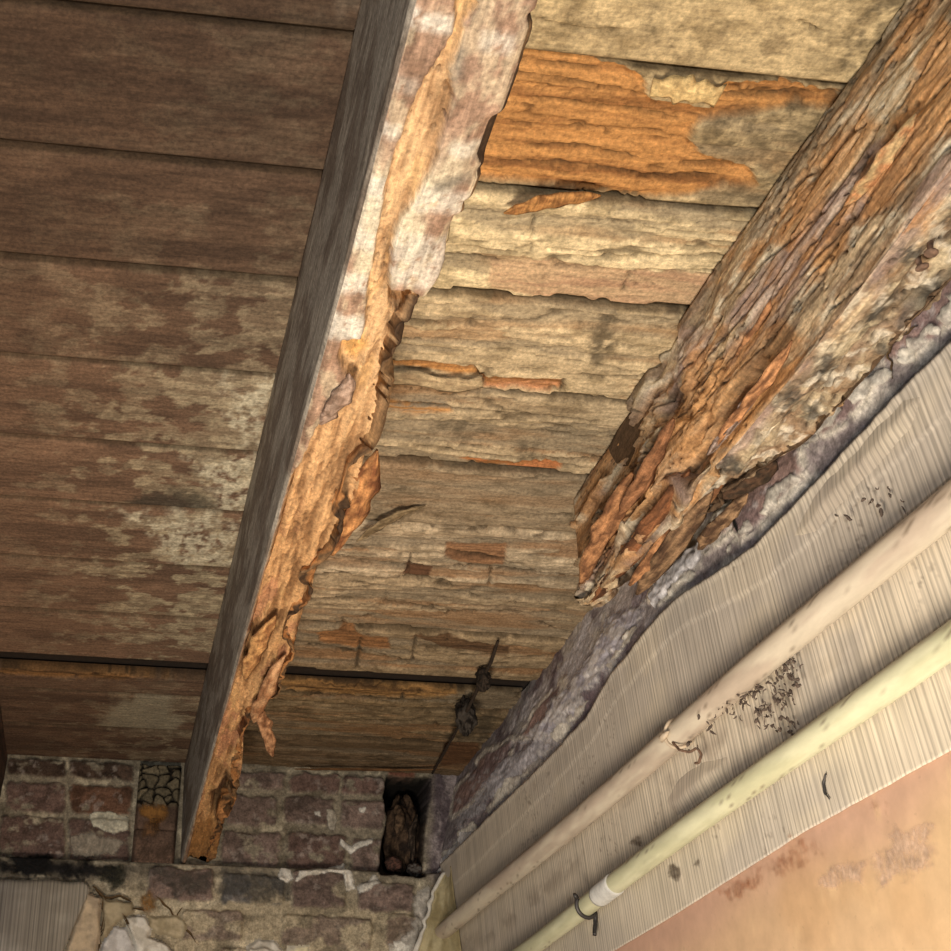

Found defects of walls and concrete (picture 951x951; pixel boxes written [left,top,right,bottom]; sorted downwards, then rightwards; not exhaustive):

peeling [649,74,727,108]
spalling [897,295,951,364]
peeling [319,373,356,425]
spalling [848,368,892,404]
spalling [804,407,840,447]
spalling [760,474,800,516]
spalling [726,521,753,553]
spalling [662,569,695,602]
spalling [606,626,637,669]
spalling [550,702,586,742]
spalling [486,768,529,814]
flaking render [65,893,187,951]